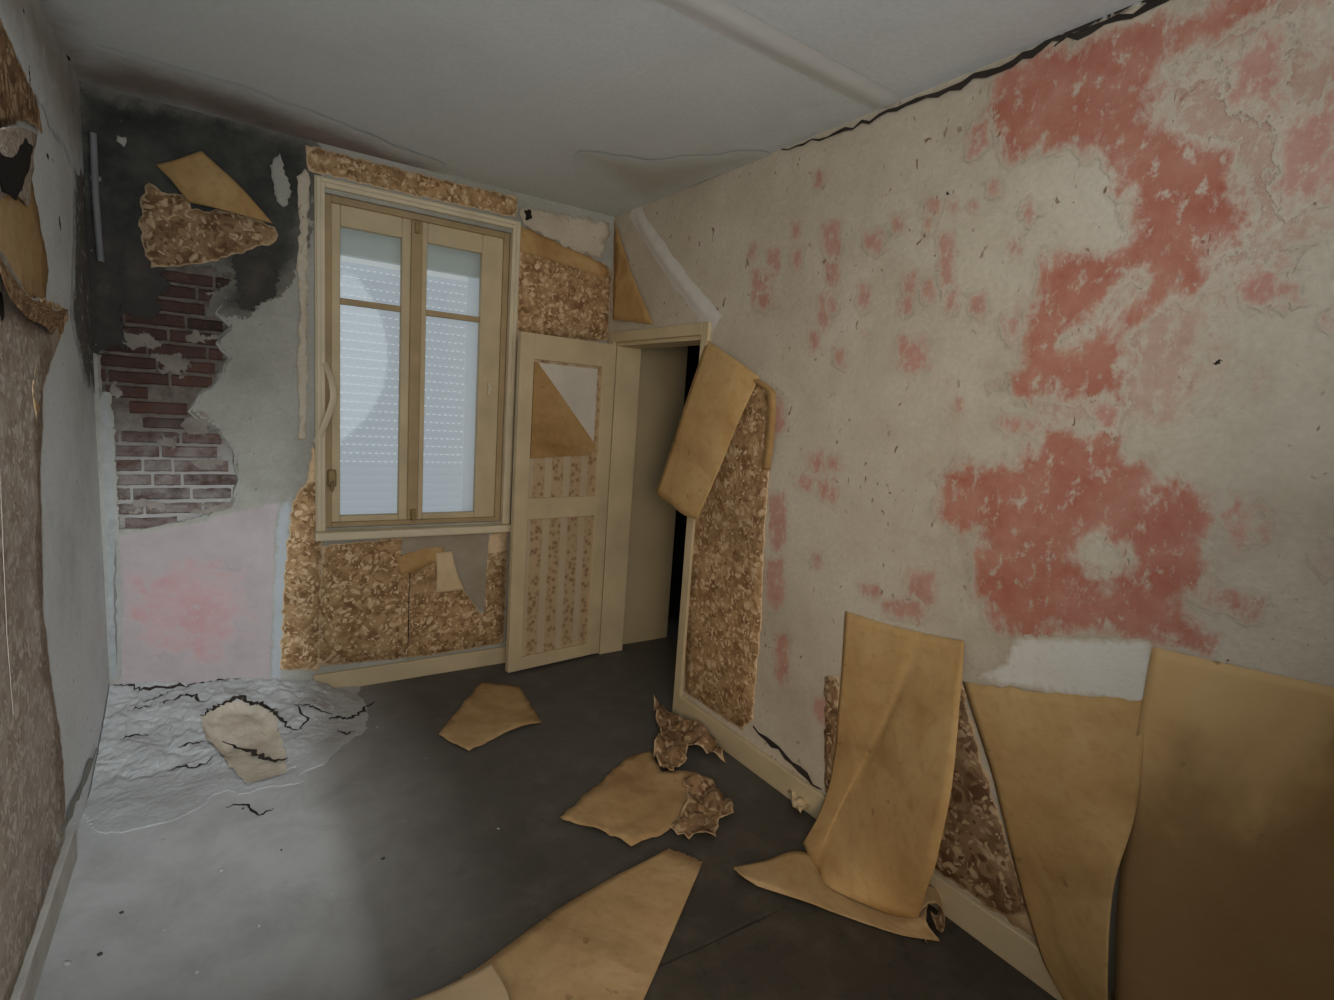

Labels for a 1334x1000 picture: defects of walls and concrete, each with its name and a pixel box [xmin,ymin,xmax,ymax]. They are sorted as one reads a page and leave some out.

crack [781,0,1169,150]
spalling [270,153,311,440]
peeling [519,206,653,325]
peeling [539,363,598,442]
spalling [96,264,241,682]
peeling [401,533,488,613]
crack [113,678,375,771]
crack [230,804,274,816]